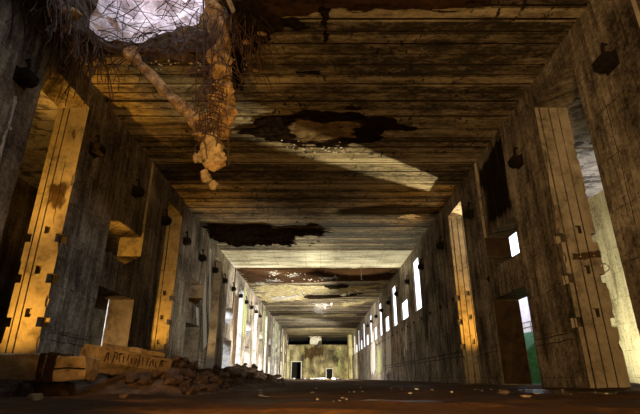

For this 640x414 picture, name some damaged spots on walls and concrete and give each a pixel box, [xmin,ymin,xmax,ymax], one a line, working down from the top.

spalling [46,0,216,71]
spalling [236,104,418,153]